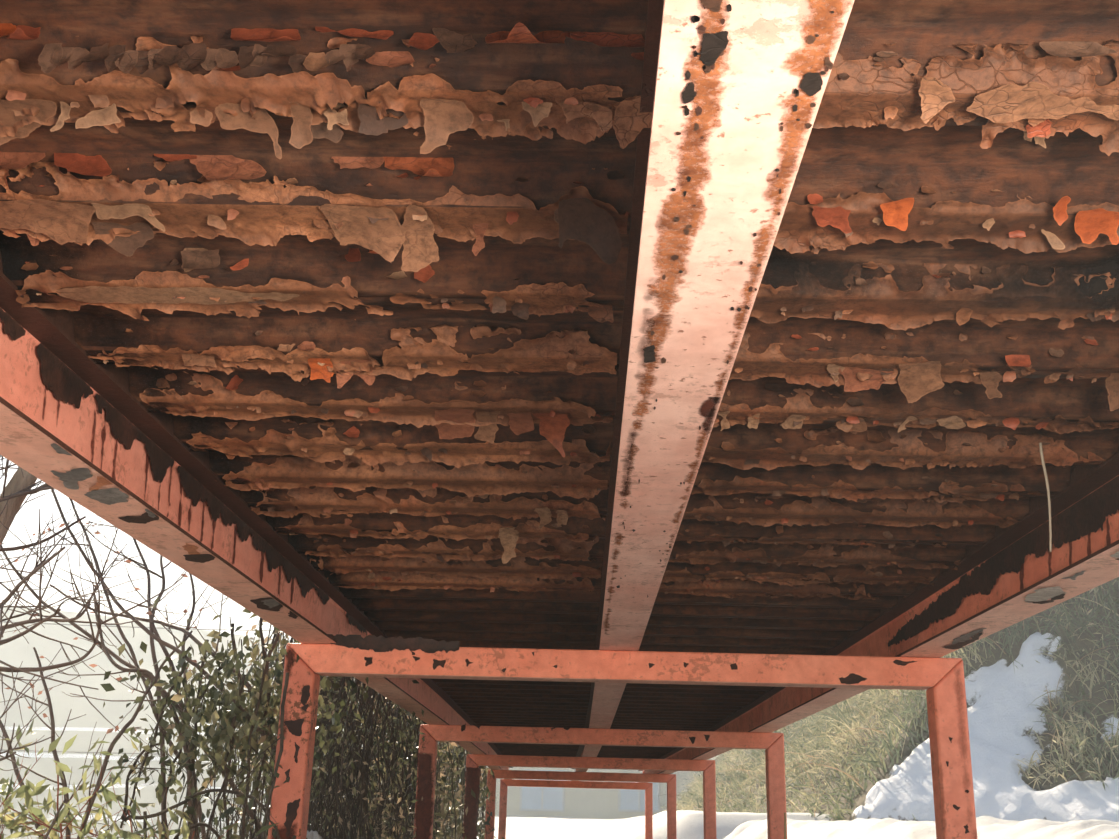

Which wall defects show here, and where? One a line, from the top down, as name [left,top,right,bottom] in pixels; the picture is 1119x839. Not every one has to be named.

peeling [812,40,1119,156]
peeling [0,22,652,604]
corrosion [621,0,732,508]
corrosion [659,0,849,567]
corrosion [91,412,118,480]
peeling [658,182,1119,649]
spalling [250,597,308,624]
peeling [328,611,473,670]
peeling [839,673,867,685]
corrosion [284,685,310,781]
corrosion [272,798,301,839]
corrosion [462,767,481,839]